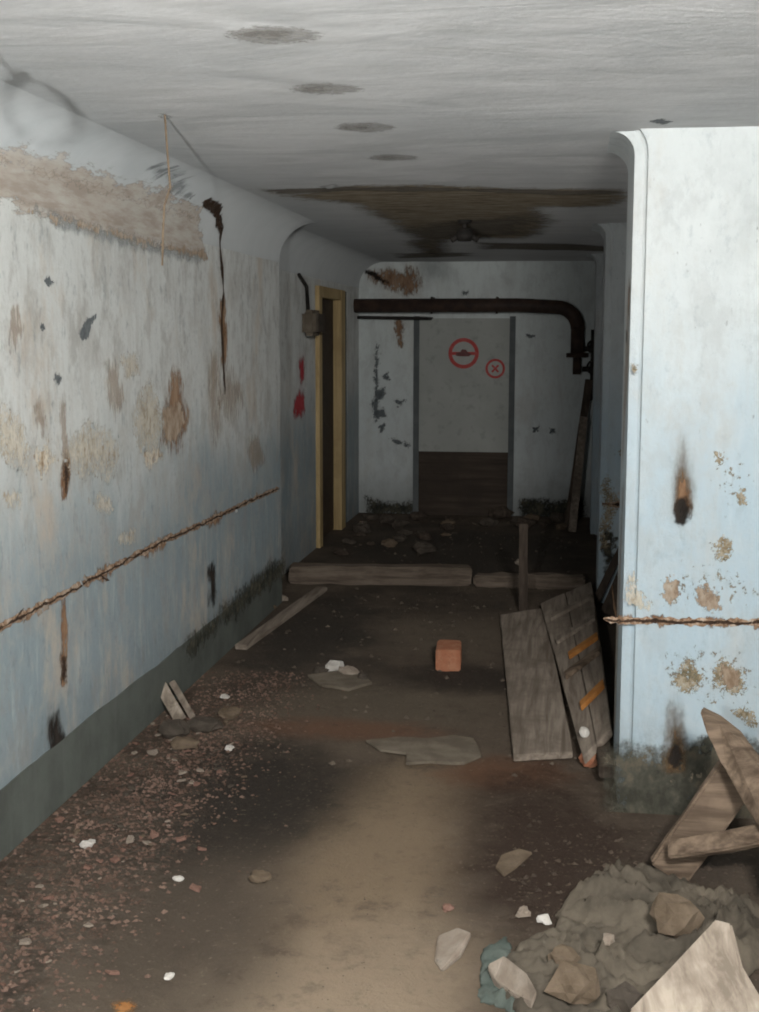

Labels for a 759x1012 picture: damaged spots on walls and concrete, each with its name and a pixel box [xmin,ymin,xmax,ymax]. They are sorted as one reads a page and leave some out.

peeling [0,146,208,260]
leakage [395,242,604,258]
crack [0,486,280,635]
crack [603,586,759,630]
peeling [623,534,759,614]
peeling [665,645,758,728]
leakage [604,737,719,815]